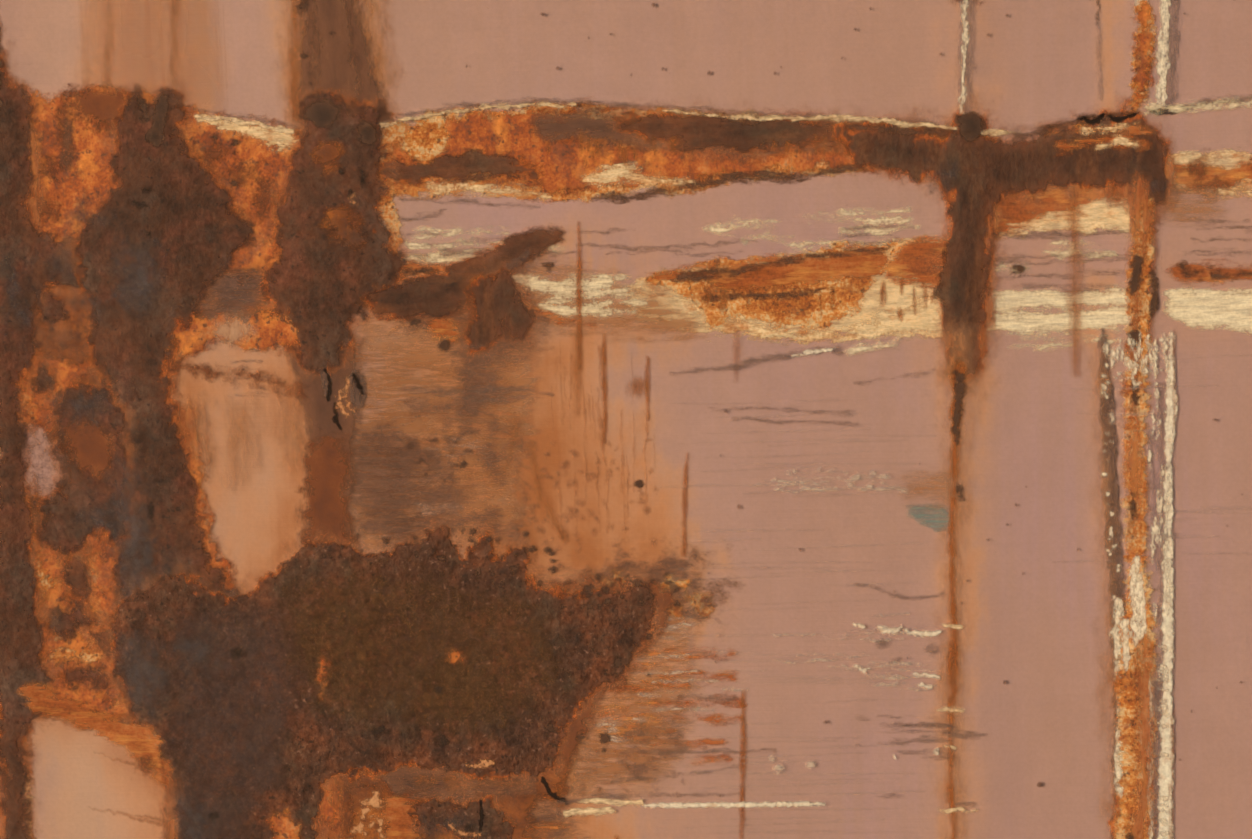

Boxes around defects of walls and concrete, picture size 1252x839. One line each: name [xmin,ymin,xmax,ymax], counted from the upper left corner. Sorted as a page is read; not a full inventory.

rust [176,0,951,322]
rust [1125,0,1156,114]
rust [16,282,746,839]
rust [624,238,976,839]
rust [0,757,9,839]